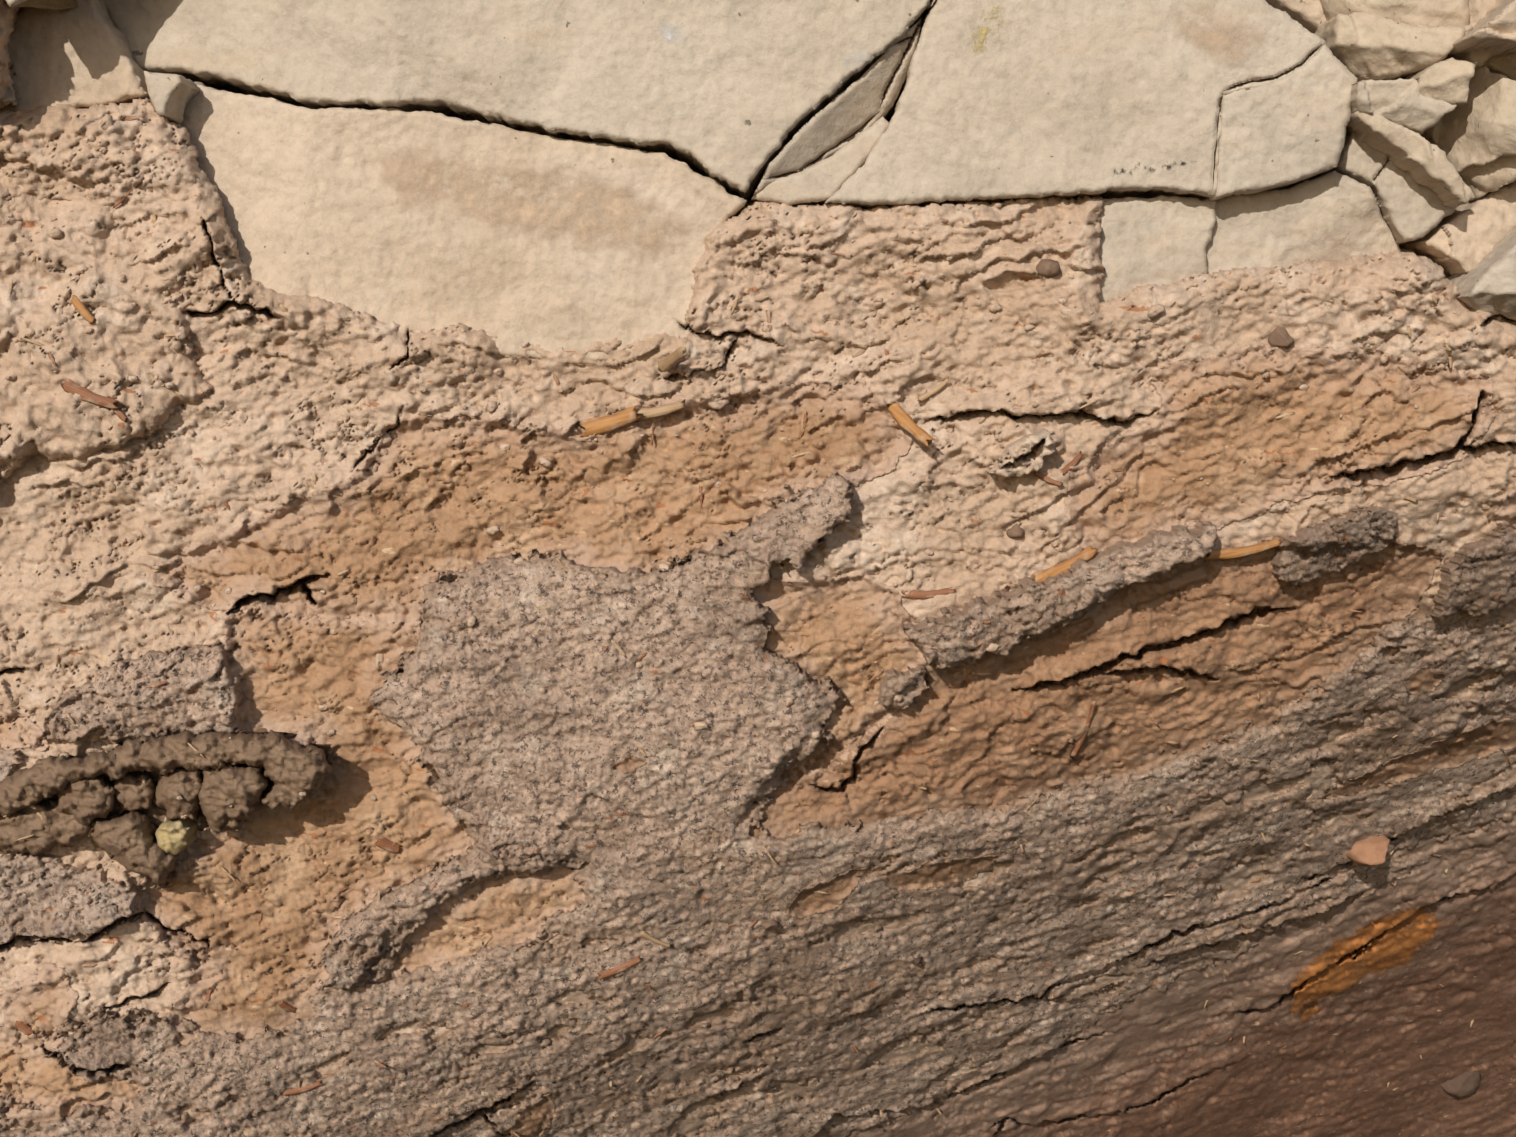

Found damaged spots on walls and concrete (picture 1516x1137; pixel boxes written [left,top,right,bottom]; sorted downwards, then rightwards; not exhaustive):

crack [765,0,932,179]
crack [1213,44,1322,183]
crack [185,217,278,318]
crack [929,409,1156,468]
crack [1331,392,1516,478]
crack [227,574,328,614]
crack [1012,607,1292,691]
flaking render [0,344,1516,1137]
crack [2,912,210,946]
crack [1225,874,1514,1014]
crack [101,982,171,1010]
crack [874,984,1055,1018]